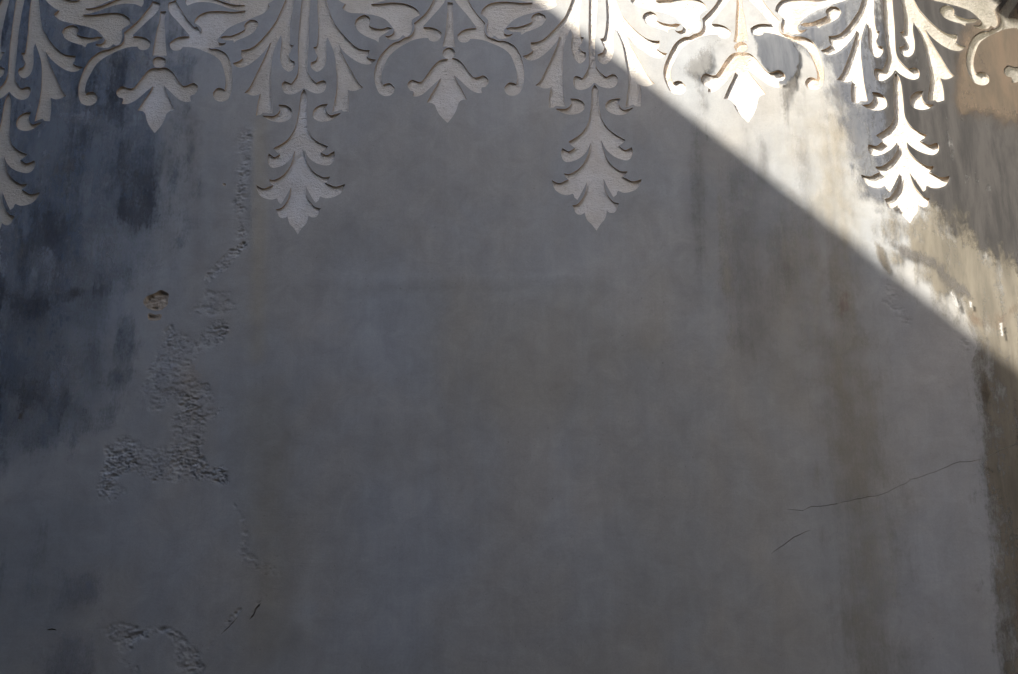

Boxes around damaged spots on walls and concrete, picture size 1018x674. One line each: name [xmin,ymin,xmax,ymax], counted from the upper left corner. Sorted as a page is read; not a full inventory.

leakage [956,5,1018,123]
leakage [0,0,156,446]
spalling [143,290,169,321]
leakage [876,203,1018,674]
crack [771,443,1018,554]